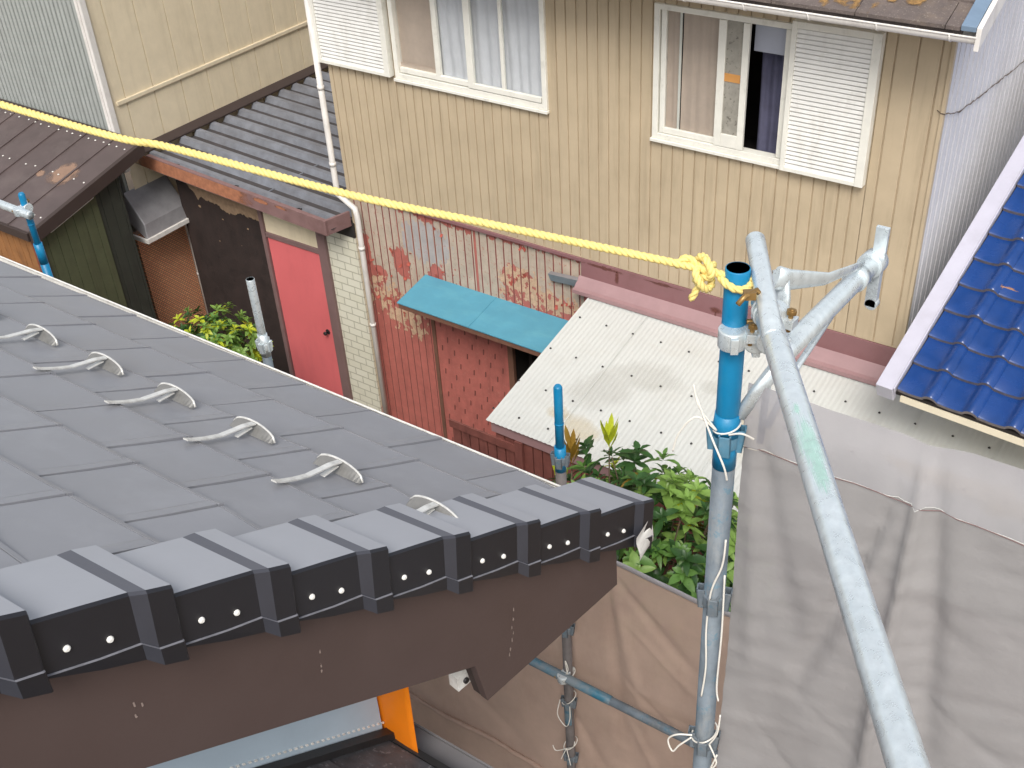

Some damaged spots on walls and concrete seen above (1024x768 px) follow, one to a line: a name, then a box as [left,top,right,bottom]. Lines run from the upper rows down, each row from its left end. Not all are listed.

flaking render [186,183,259,230]
peeling [352,199,584,342]